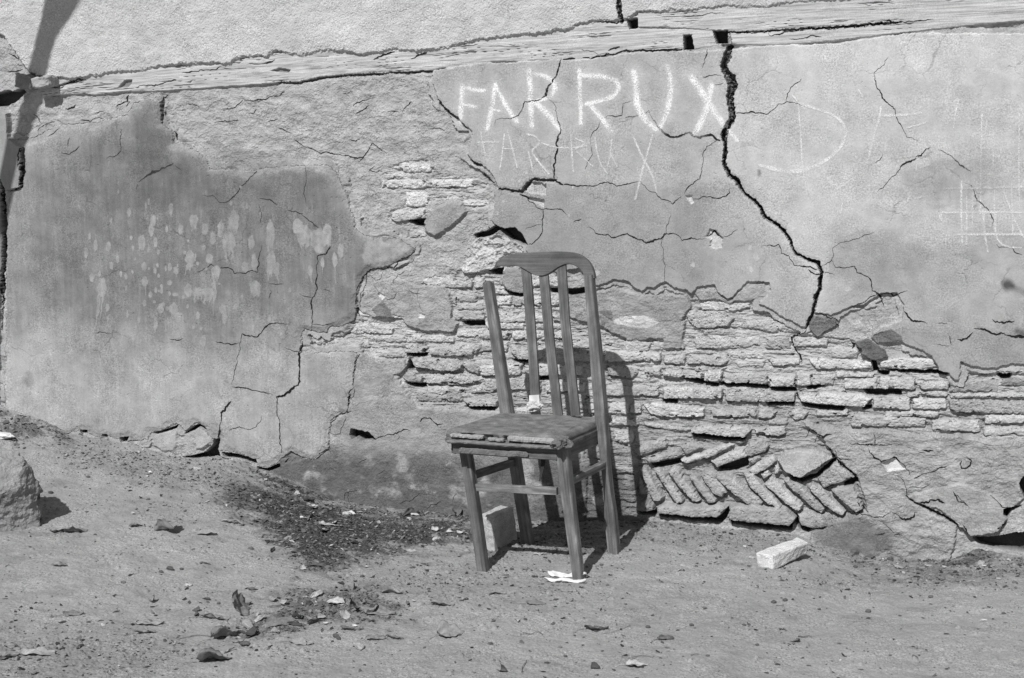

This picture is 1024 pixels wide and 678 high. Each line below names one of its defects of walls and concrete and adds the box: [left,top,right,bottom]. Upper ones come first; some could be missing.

crack [33,66,385,452]
crack [311,354,360,470]
crack [373,51,427,60]
spalling [0,34,1024,569]
crack [499,0,1024,399]
spalling [681,21,1024,52]